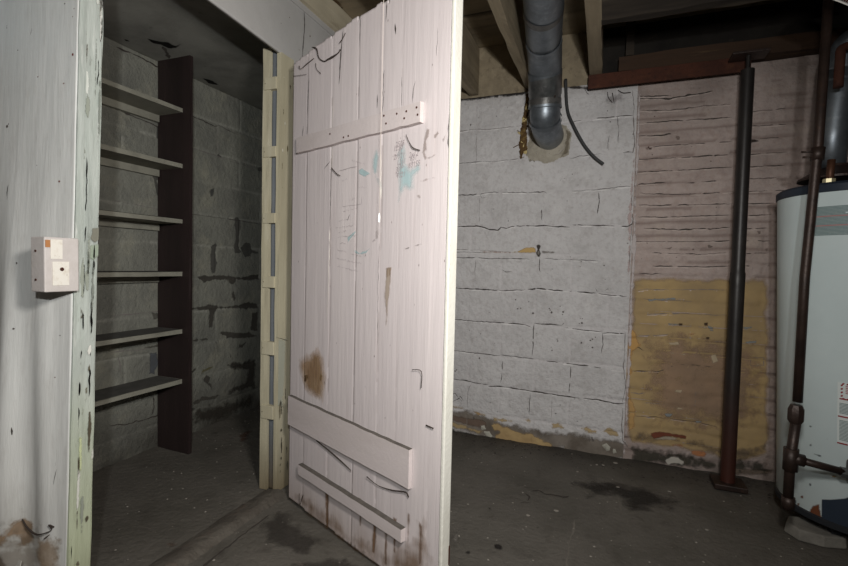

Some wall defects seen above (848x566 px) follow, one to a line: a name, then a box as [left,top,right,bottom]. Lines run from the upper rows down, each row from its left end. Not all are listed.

peeling [452,279,729,458]
peeling [736,280,768,459]
leakage [0,519,33,545]
leakage [583,483,662,509]